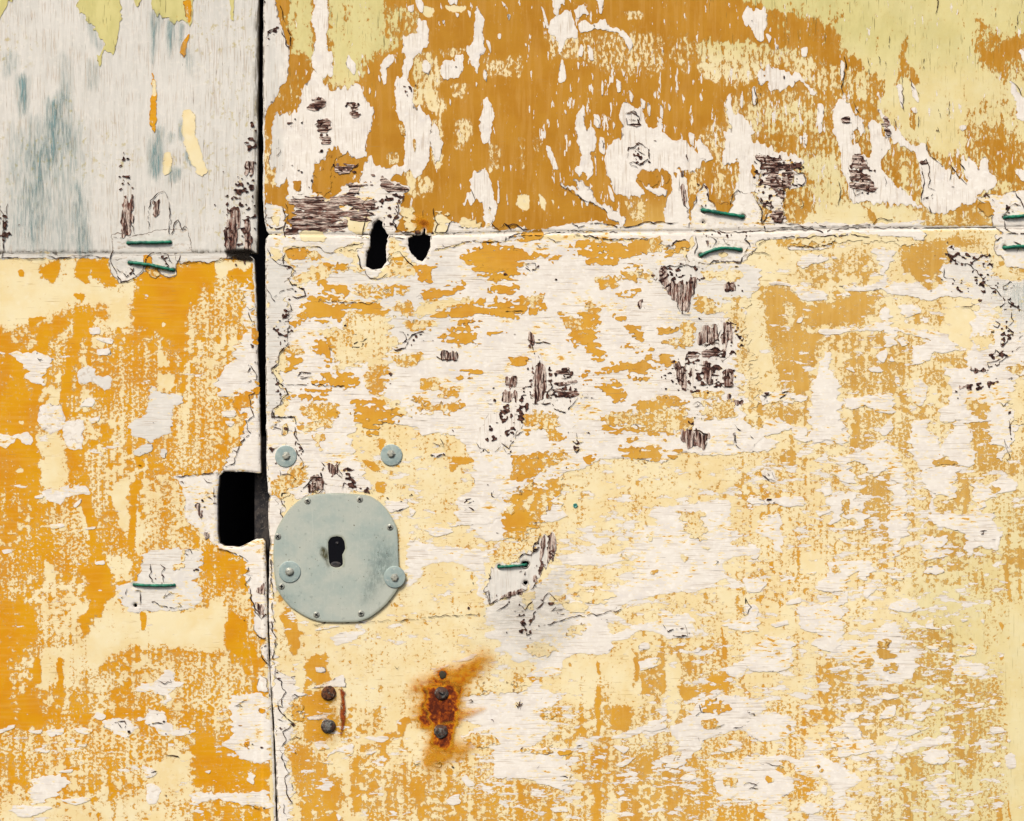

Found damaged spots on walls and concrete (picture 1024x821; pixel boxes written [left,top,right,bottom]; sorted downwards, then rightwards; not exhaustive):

peeling [541,0,633,91]
peeling [742,5,778,49]
peeling [263,0,501,197]
peeling [0,229,231,283]
peeling [0,351,54,386]
peeling [0,432,33,448]
peeling [37,398,100,450]
peeling [128,386,184,466]
peeling [189,64,1024,821]
peeling [115,547,204,613]
peeling [28,670,196,747]
corrosion [413,657,486,763]